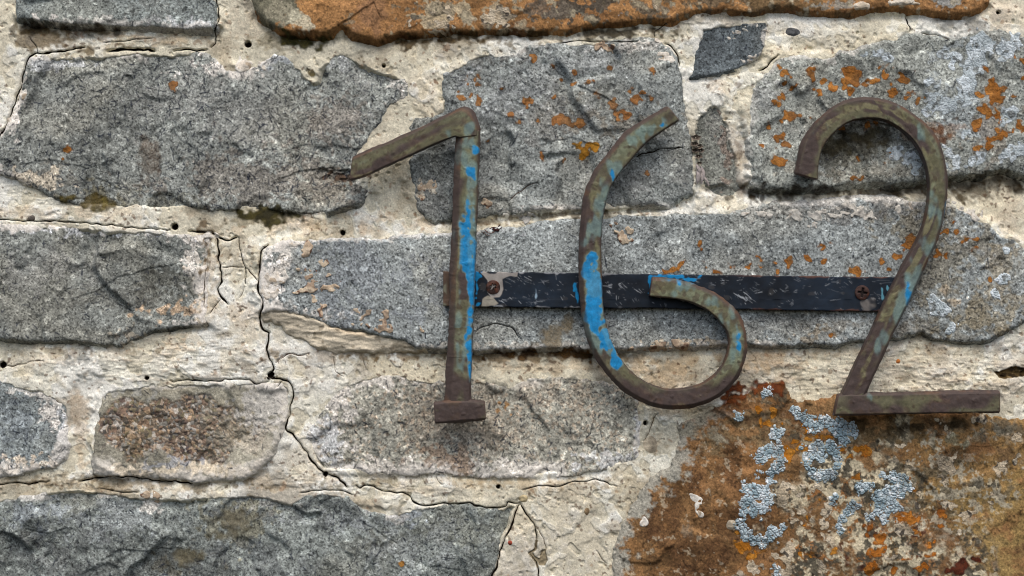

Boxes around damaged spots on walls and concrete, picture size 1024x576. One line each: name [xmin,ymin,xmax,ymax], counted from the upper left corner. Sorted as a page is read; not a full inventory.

crack [0,0,220,136]
crack [0,219,615,576]